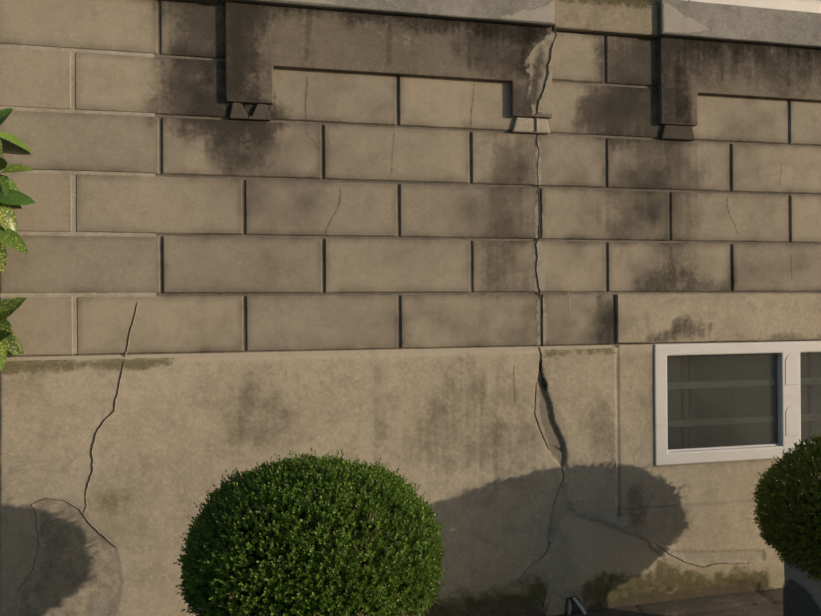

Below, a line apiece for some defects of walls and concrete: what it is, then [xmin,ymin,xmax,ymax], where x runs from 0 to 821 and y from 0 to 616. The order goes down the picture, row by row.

peeling [496,0,555,23]
damp [162,3,267,135]
peeling [526,33,552,115]
damp [600,40,691,124]
crack [534,28,557,379]
crack [17,303,138,592]
spalling [534,366,564,466]
crack [658,545,750,568]